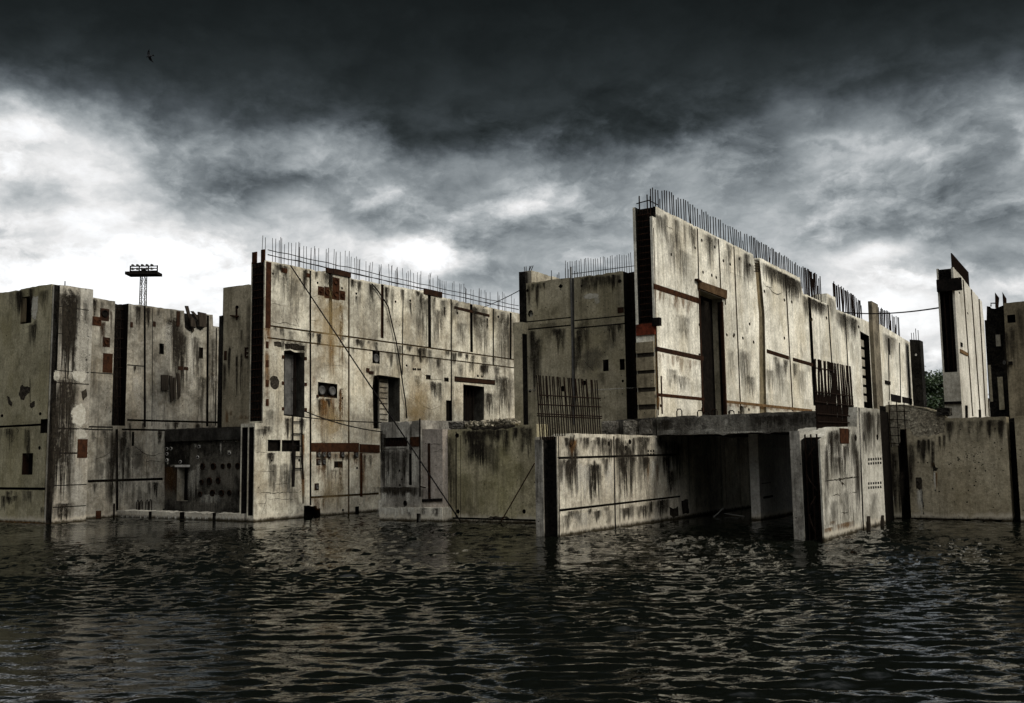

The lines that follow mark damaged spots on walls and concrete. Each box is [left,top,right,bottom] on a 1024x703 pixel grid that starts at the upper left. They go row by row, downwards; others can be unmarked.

damp [581,275,620,299]
rust [329,306,343,367]
damp [531,331,539,384]
damp [41,288,145,520]
damp [463,427,532,469]
damp [560,420,681,529]
damp [731,416,783,433]
damp [891,421,952,512]
damp [969,421,1004,439]